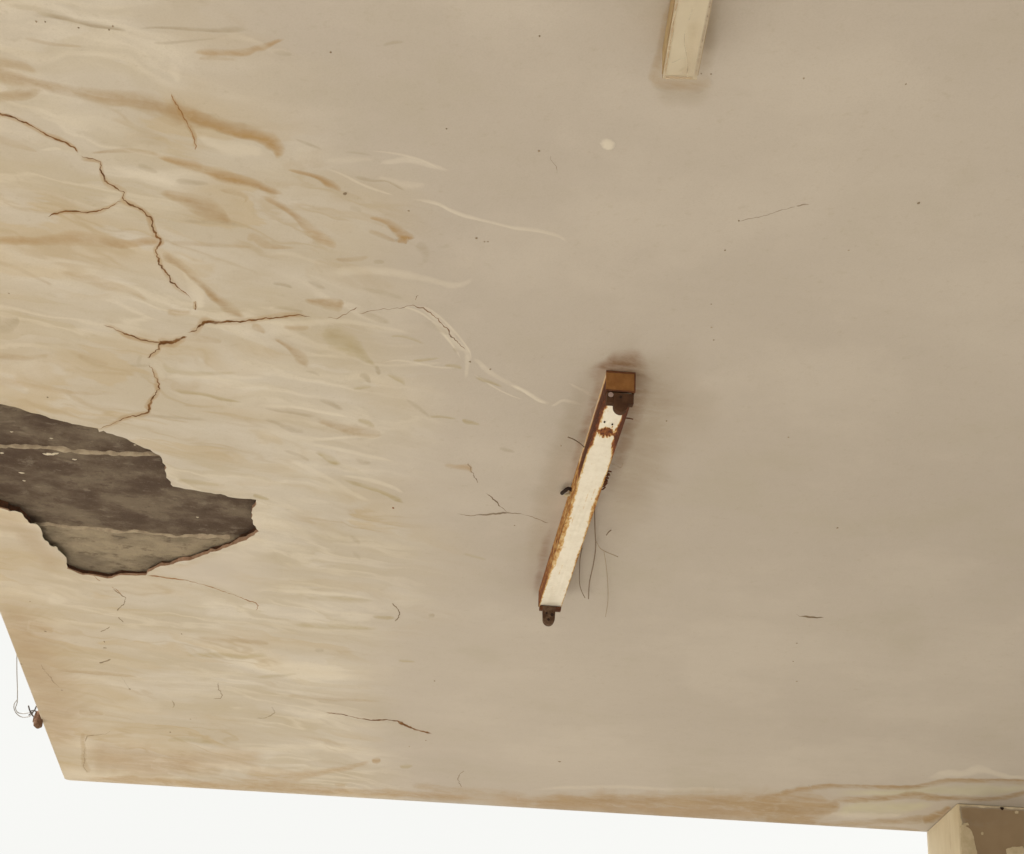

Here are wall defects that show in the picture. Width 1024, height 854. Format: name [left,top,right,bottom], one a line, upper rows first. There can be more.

damp [22,4,306,55]
crack [170,93,198,150]
crack [0,111,466,432]
damp [0,55,575,426]
damp [0,509,67,576]
spalling [0,404,259,578]
crack [146,575,259,611]
damp [128,353,408,506]
crack [456,464,548,523]
corrosion [518,324,734,601]
crack [324,712,433,734]
damp [0,585,1024,832]